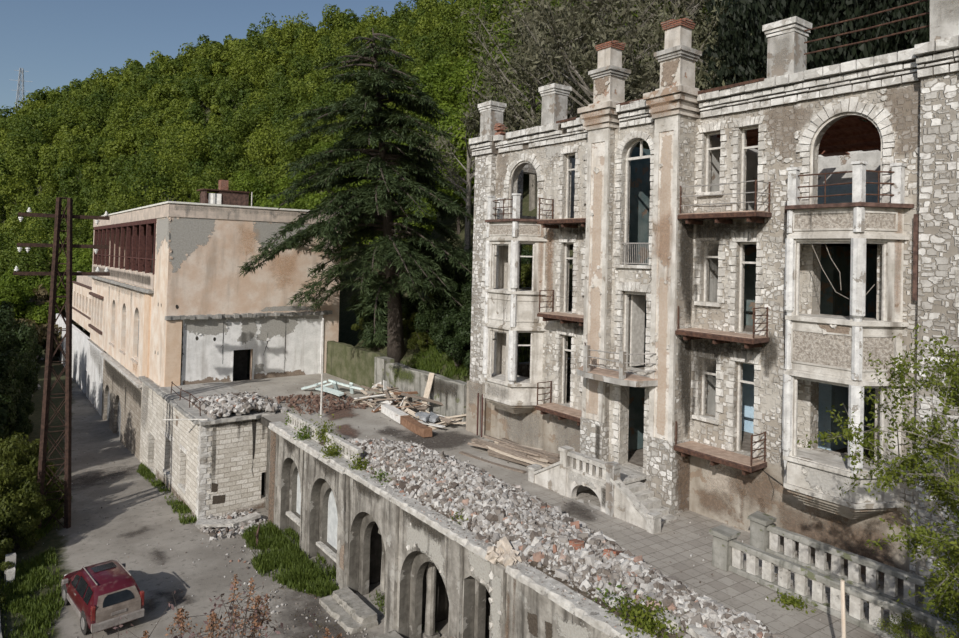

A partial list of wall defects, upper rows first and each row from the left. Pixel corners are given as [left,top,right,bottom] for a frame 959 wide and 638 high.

peeling [156,217,216,273]
peeling [184,316,319,345]
spalling [182,375,231,385]
spalling [254,364,306,379]
damp [677,453,690,511]
damp [701,467,776,512]
damp [781,508,896,580]
peeling [527,612,591,638]